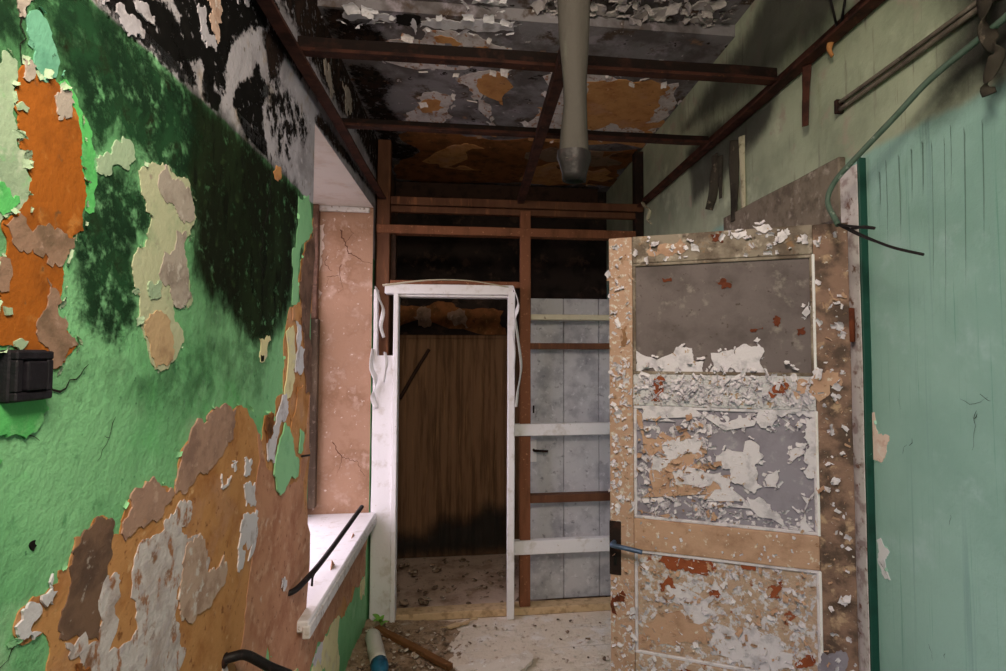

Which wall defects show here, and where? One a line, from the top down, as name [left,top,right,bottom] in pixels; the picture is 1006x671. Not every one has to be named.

leakage [0,0,24,43]
peeling [530,0,558,16]
peeling [590,0,737,28]
peeling [382,61,682,187]
peeling [0,0,197,376]
leakage [34,0,419,345]
crack [51,364,89,393]
spalling [6,195,367,671]
peeling [872,412,890,464]